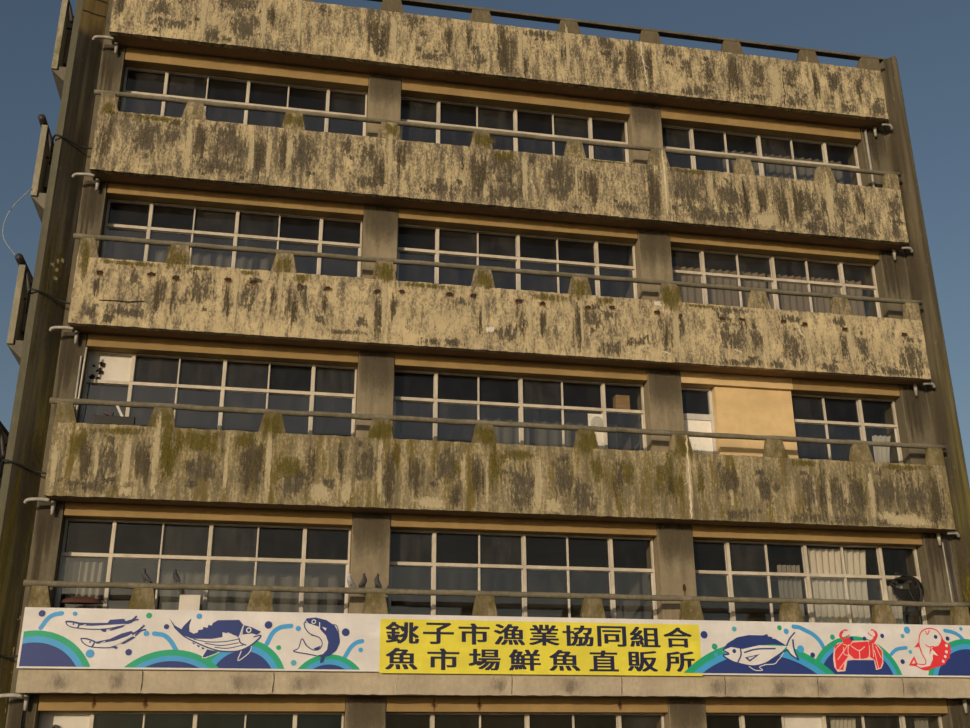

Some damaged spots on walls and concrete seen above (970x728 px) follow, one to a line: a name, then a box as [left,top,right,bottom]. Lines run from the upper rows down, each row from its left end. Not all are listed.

water stain [494,26,529,77]
water stain [622,41,654,88]
water stain [247,126,293,182]
water stain [644,155,670,215]
water stain [742,182,804,229]
water stain [1,441,60,587]
water stain [118,411,162,499]
water stain [222,431,272,497]
water stain [306,443,353,505]
water stain [408,452,489,509]
water stain [533,456,564,514]
water stain [811,467,849,523]